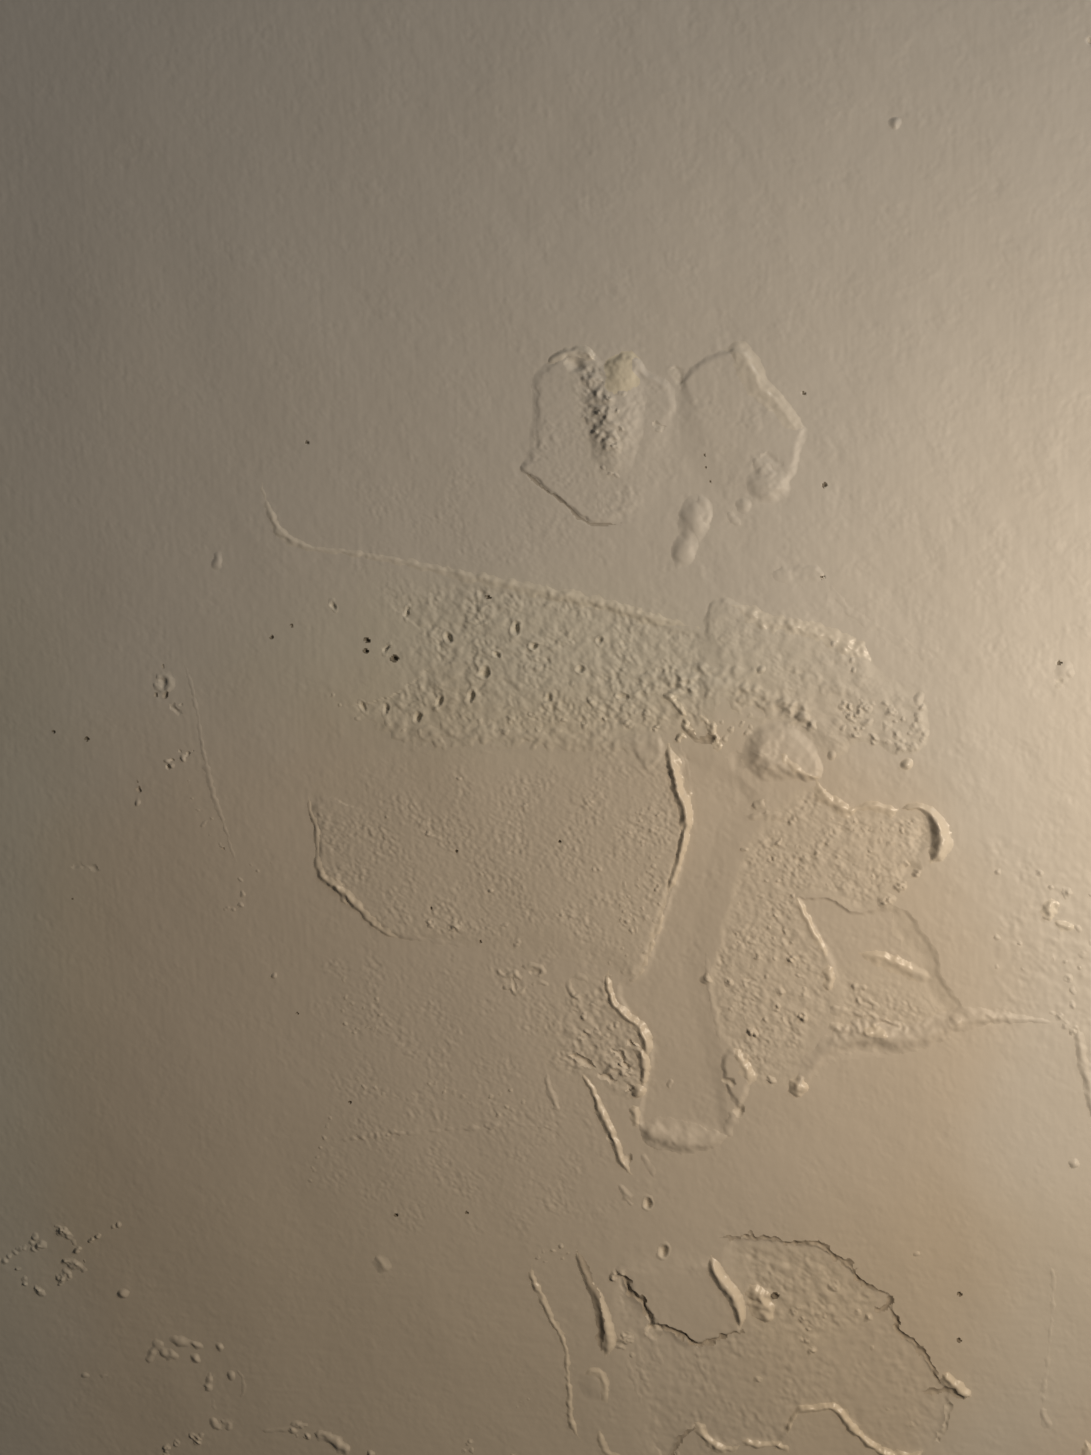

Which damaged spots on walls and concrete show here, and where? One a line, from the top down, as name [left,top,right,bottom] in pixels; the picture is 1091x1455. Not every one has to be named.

flaking render [260,477,962,1165]
peeling [1035,869,1091,1142]
peeling [609,1230,971,1455]